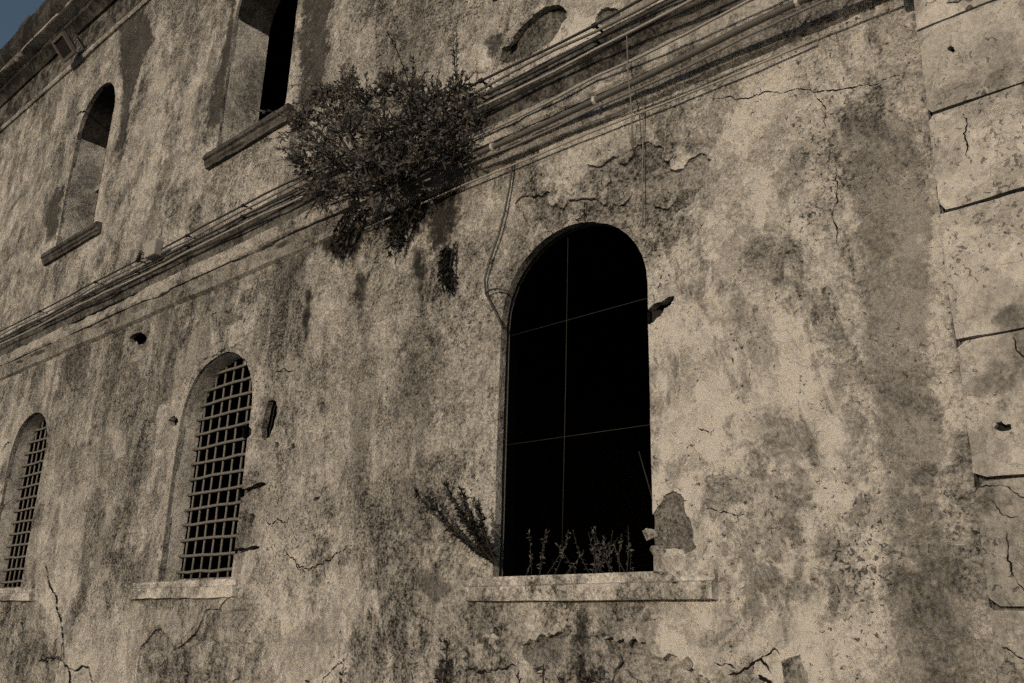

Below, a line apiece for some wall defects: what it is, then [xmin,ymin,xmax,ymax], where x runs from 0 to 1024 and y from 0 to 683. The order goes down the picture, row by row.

water stain [485,33,503,57]
peeling [516,142,711,236]
water stain [319,222,370,263]
water stain [382,184,462,293]
water stain [302,290,311,340]
water stain [353,270,369,324]
peeling [643,492,696,556]
spalling [126,588,343,683]
spalling [528,633,564,666]
water stain [575,609,588,680]
spalling [606,634,709,683]
peeling [781,655,808,683]